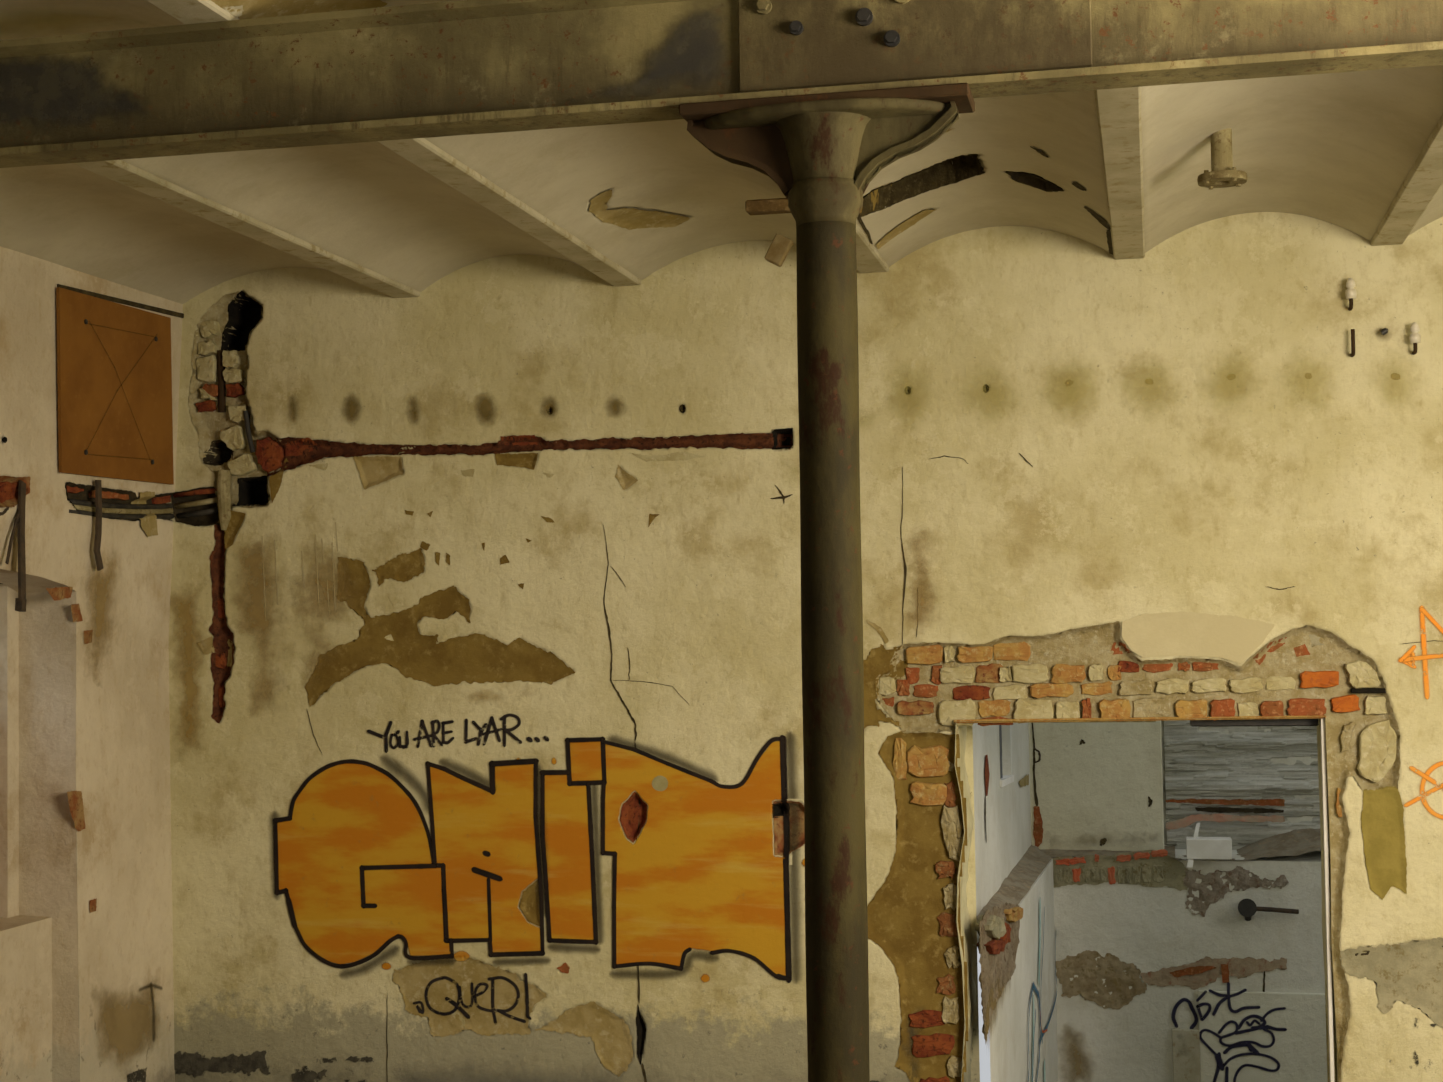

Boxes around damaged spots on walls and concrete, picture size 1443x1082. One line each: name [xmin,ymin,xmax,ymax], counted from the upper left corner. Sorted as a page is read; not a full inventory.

peeling [211,0,388,20]
spalling [859,154,986,249]
spalling [1005,171,1064,192]
flaking render [0,476,31,516]
flaking render [301,522,575,707]
crack [603,525,687,744]
spalling [772,801,805,856]
flaking render [863,620,1443,1082]
crack [636,966,647,1082]